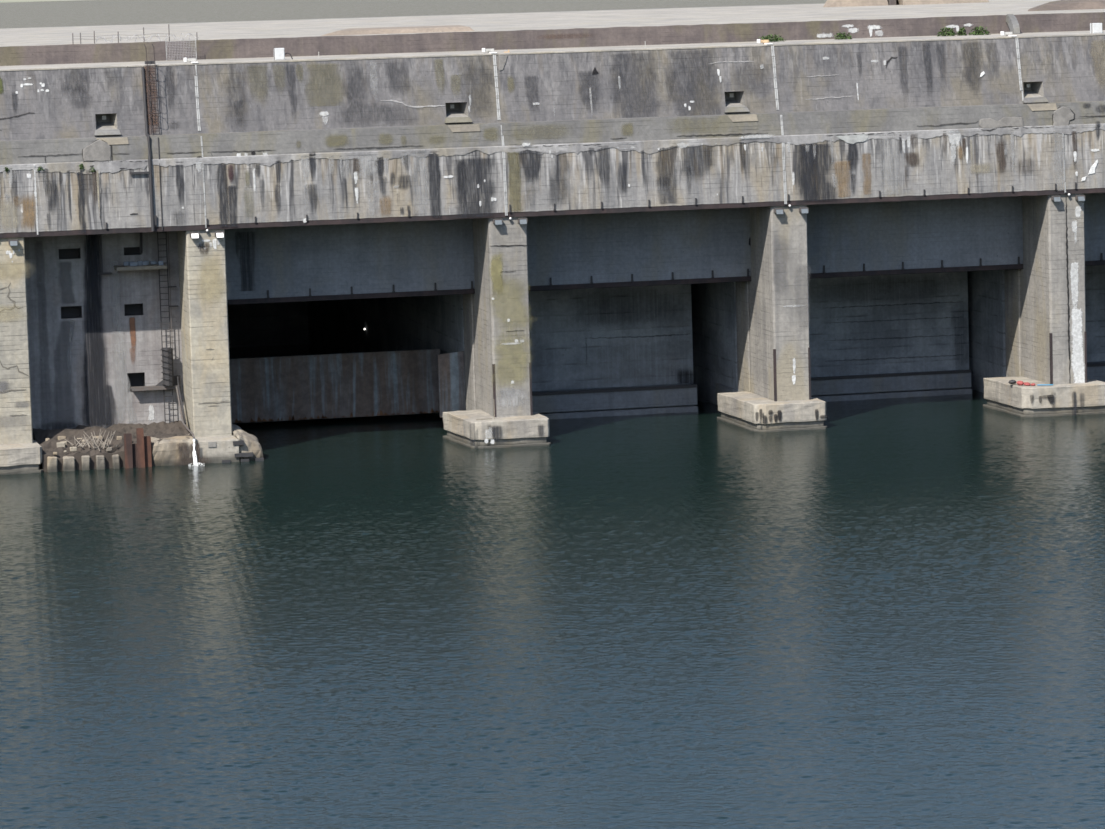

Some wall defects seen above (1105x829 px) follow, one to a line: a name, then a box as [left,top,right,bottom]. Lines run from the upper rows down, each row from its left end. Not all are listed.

leakage [176,162,184,209]
leakage [301,152,316,206]
leakage [340,155,408,214]
leakage [428,152,496,218]
leakage [520,147,541,179]
leakage [792,139,857,201]
leakage [899,133,917,166]
leakage [948,131,1014,172]
leakage [1063,122,1100,185]
leakage [202,164,253,291]
crack [0,284,22,312]
leakage [2,164,114,430]